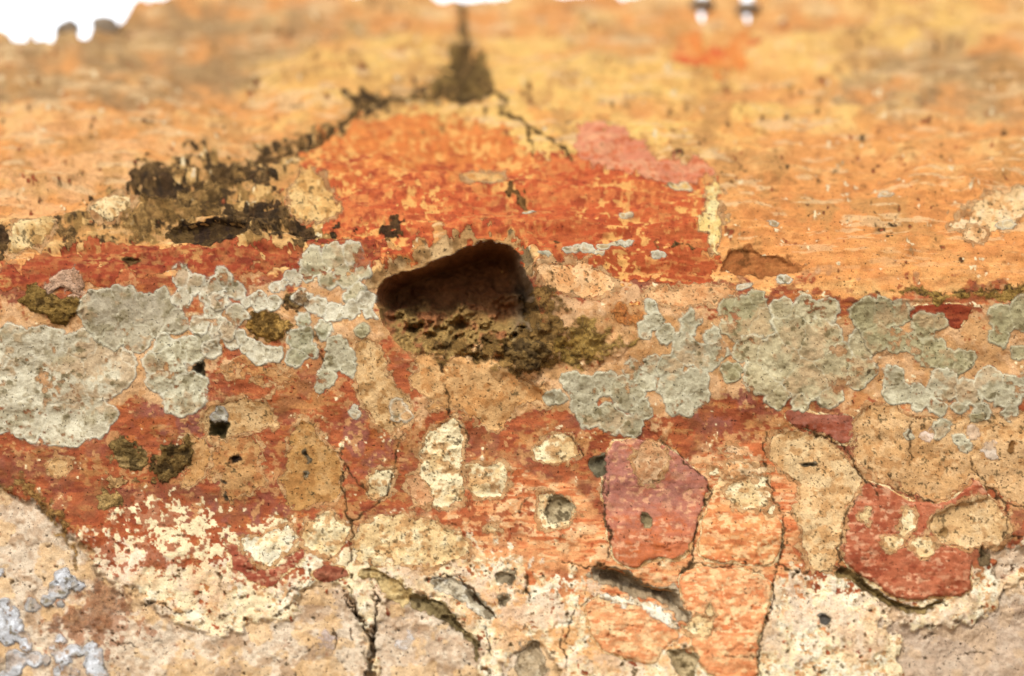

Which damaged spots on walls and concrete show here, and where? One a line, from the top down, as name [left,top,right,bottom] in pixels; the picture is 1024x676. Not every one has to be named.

flaking render [284,166,343,226]
flaking render [459,169,509,184]
flaking render [696,178,731,257]
flaking render [533,254,622,301]
crack [293,436,402,676]
crack [563,476,613,569]
crack [660,425,935,676]
crack [971,462,1024,539]
crack [426,573,496,655]